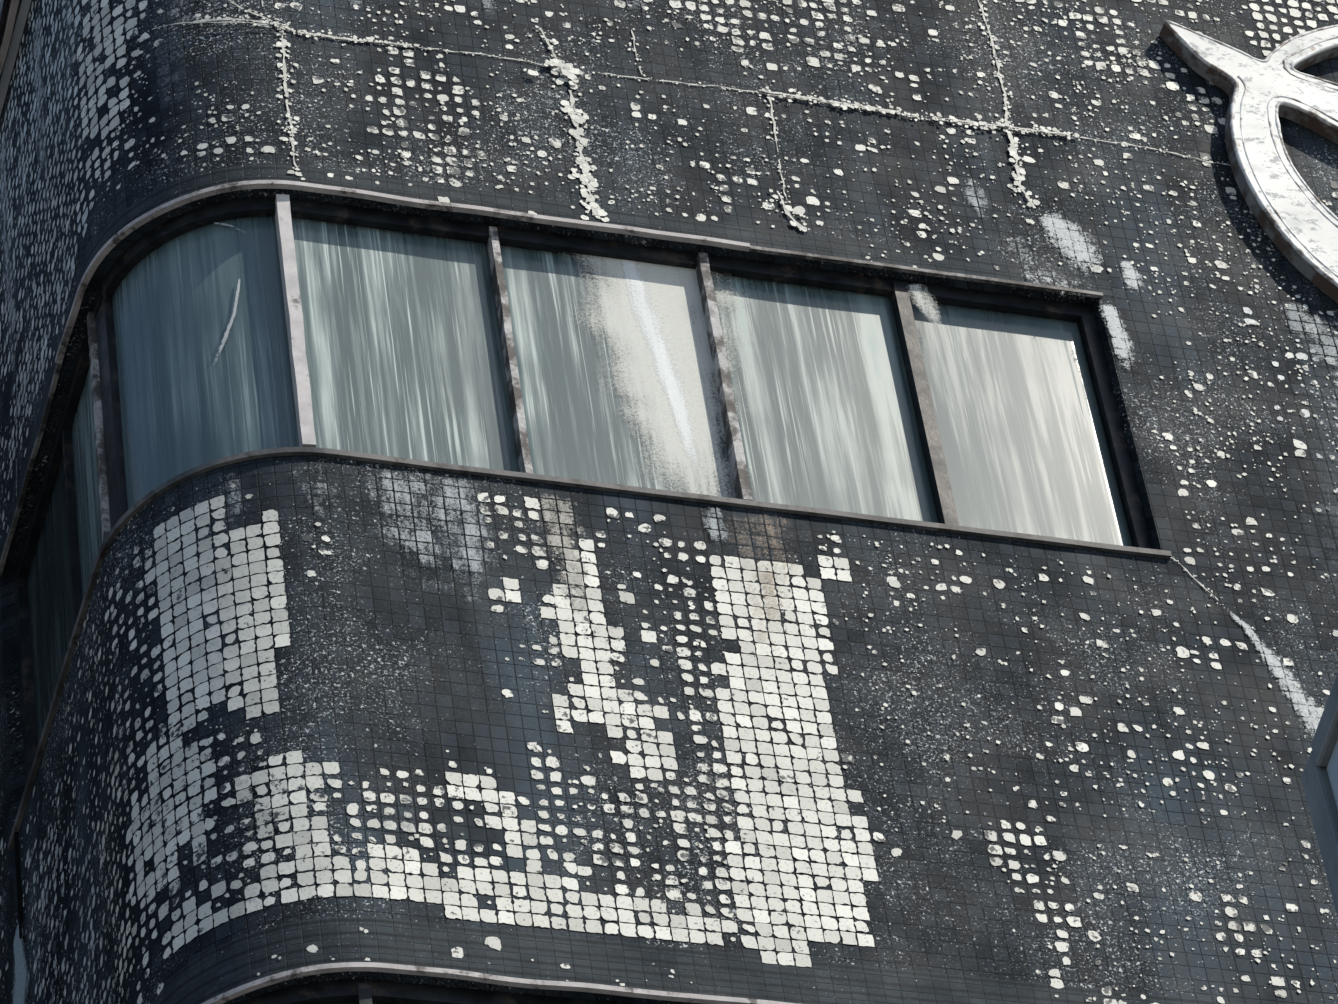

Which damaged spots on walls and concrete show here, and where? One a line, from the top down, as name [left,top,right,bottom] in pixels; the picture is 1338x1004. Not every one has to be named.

peeling [275,2,314,20]
peeling [0,0,283,538]
water stain [575,253,738,541]
spalling [309,0,1338,614]
water stain [966,179,987,216]
peeling [0,483,1338,1004]
water stain [1230,611,1323,738]